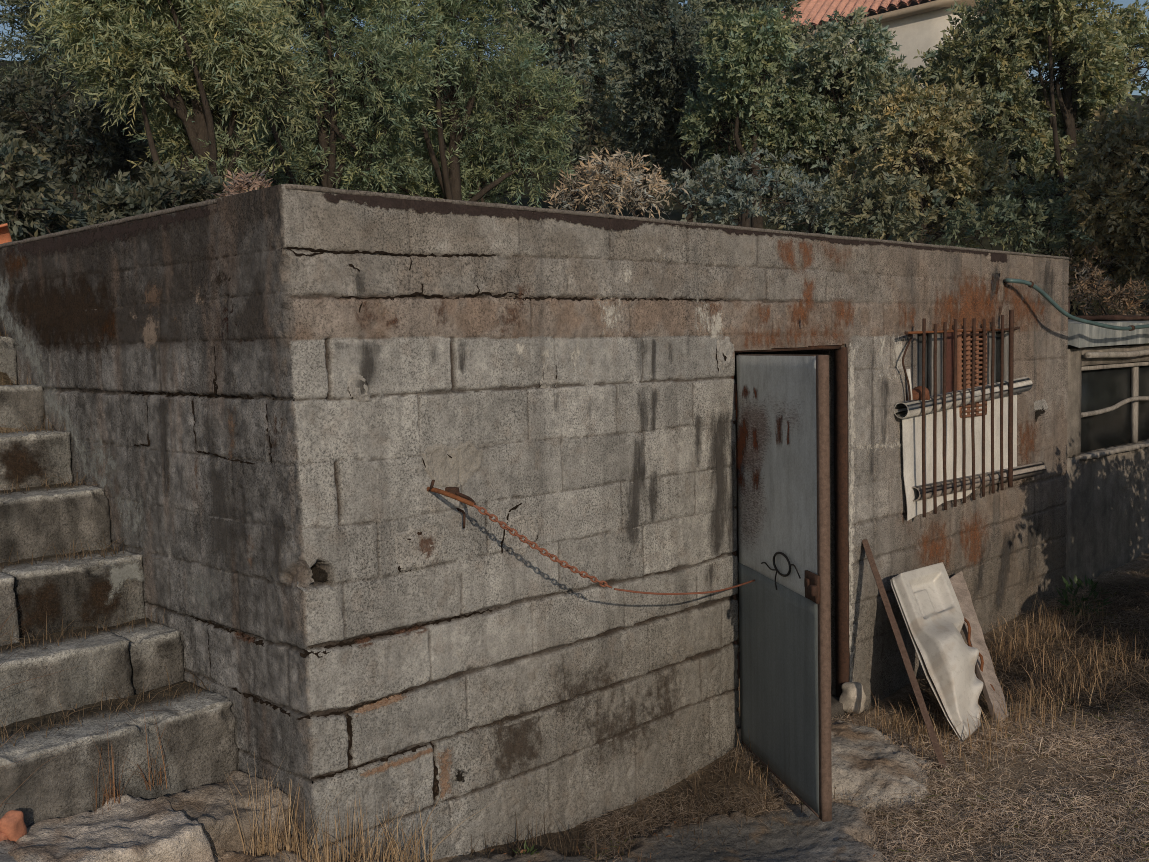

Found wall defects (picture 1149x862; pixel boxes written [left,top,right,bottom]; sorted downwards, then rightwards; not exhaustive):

rust [745,279,854,347]
rust [933,276,1044,330]
leakage [0,278,141,535]
leakage [628,340,657,543]
rust [736,386,760,492]
rust [775,416,789,445]
leakage [695,414,735,583]
spalling [297,564,328,595]